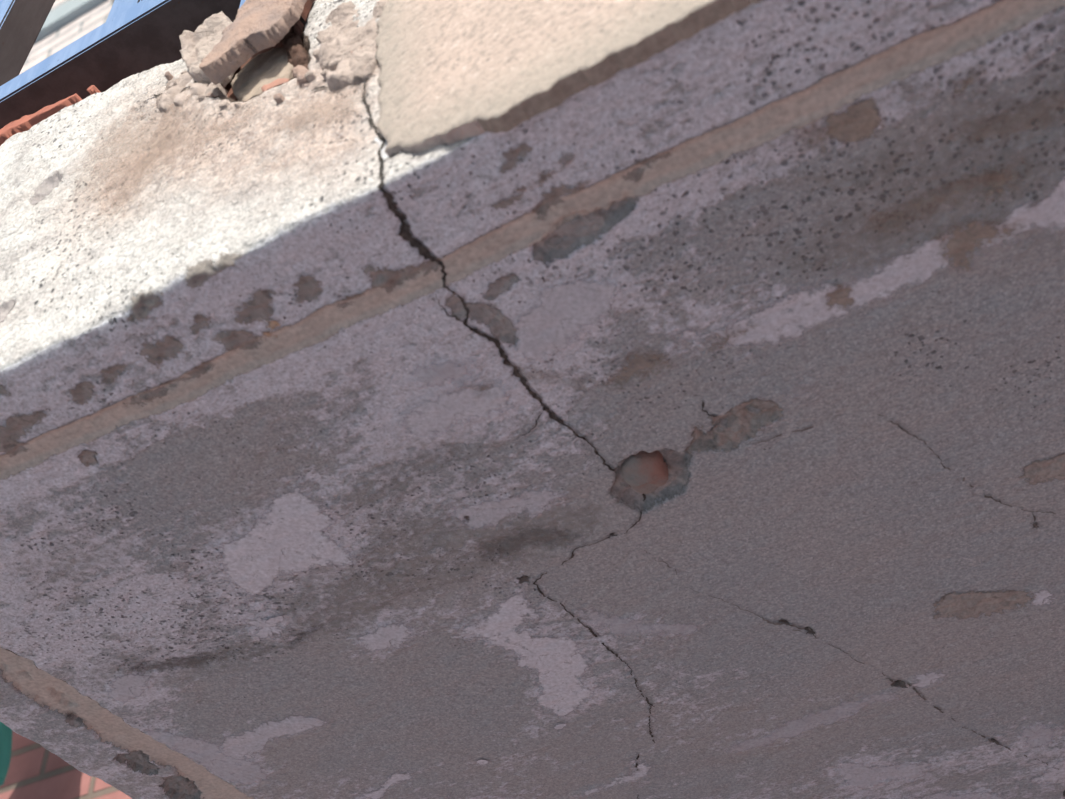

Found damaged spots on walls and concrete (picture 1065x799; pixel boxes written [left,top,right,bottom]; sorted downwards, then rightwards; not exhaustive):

spalling [302,3,313,70]
spalling [610,398,784,511]
crack [362,79,1060,799]
spalling [933,589,1056,620]